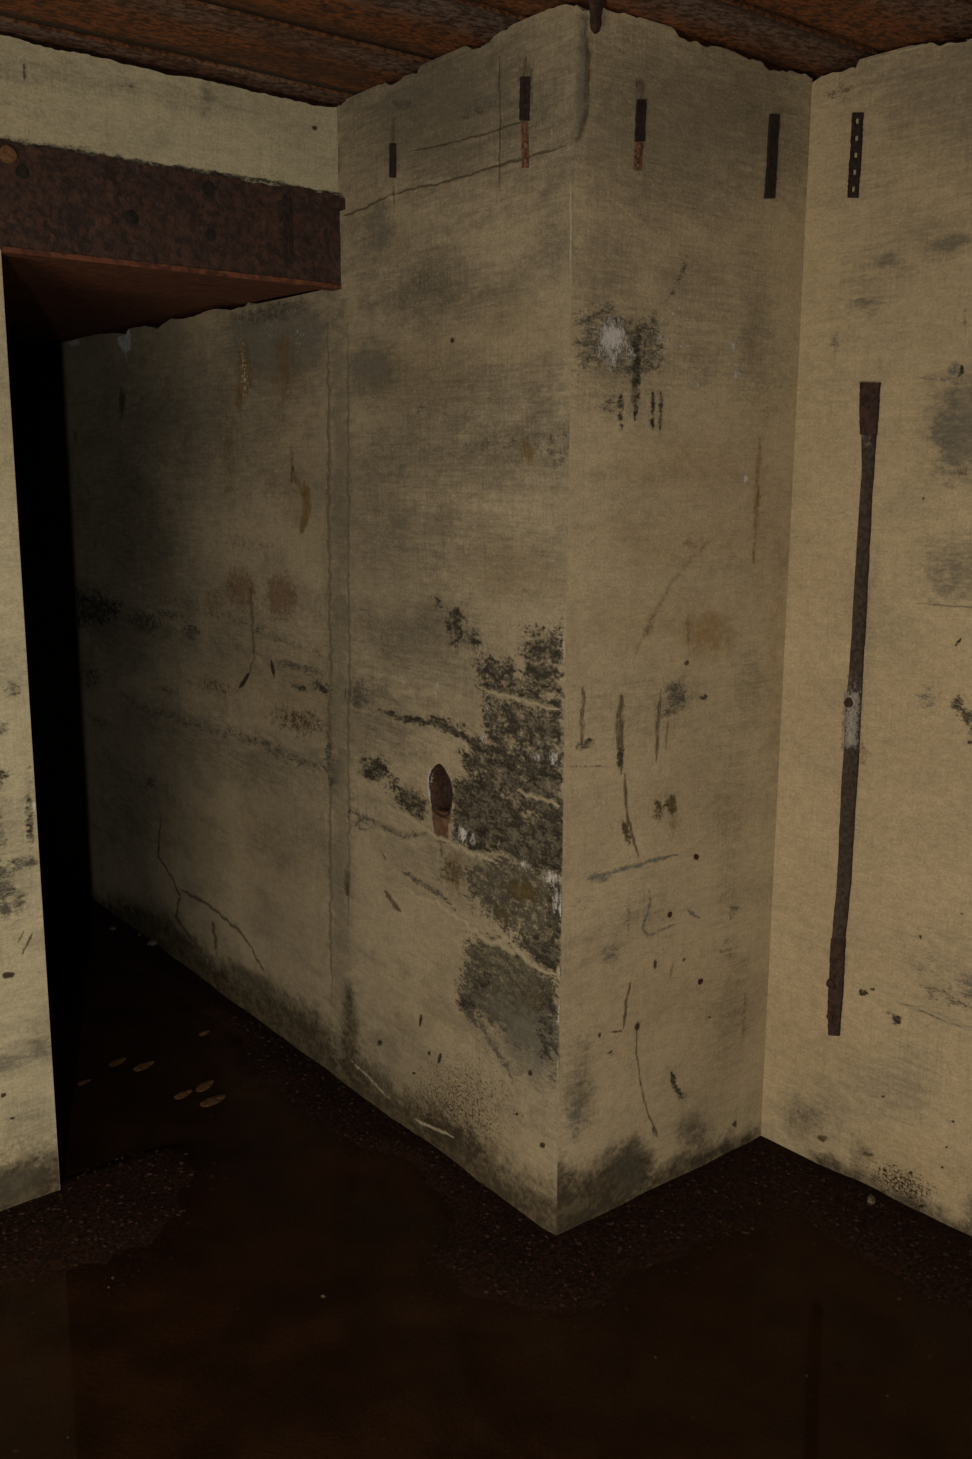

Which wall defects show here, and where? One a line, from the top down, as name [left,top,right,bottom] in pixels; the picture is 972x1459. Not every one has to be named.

corrosion [586,0,607,34]
water stain [573,304,698,430]
water stain [952,697,972,744]
water stain [25,794,36,838]
corrosion [432,808,451,855]
water stain [0,859,36,915]
crack [158,818,264,971]
water stain [95,597,754,1236]
water stain [815,1156,972,1234]